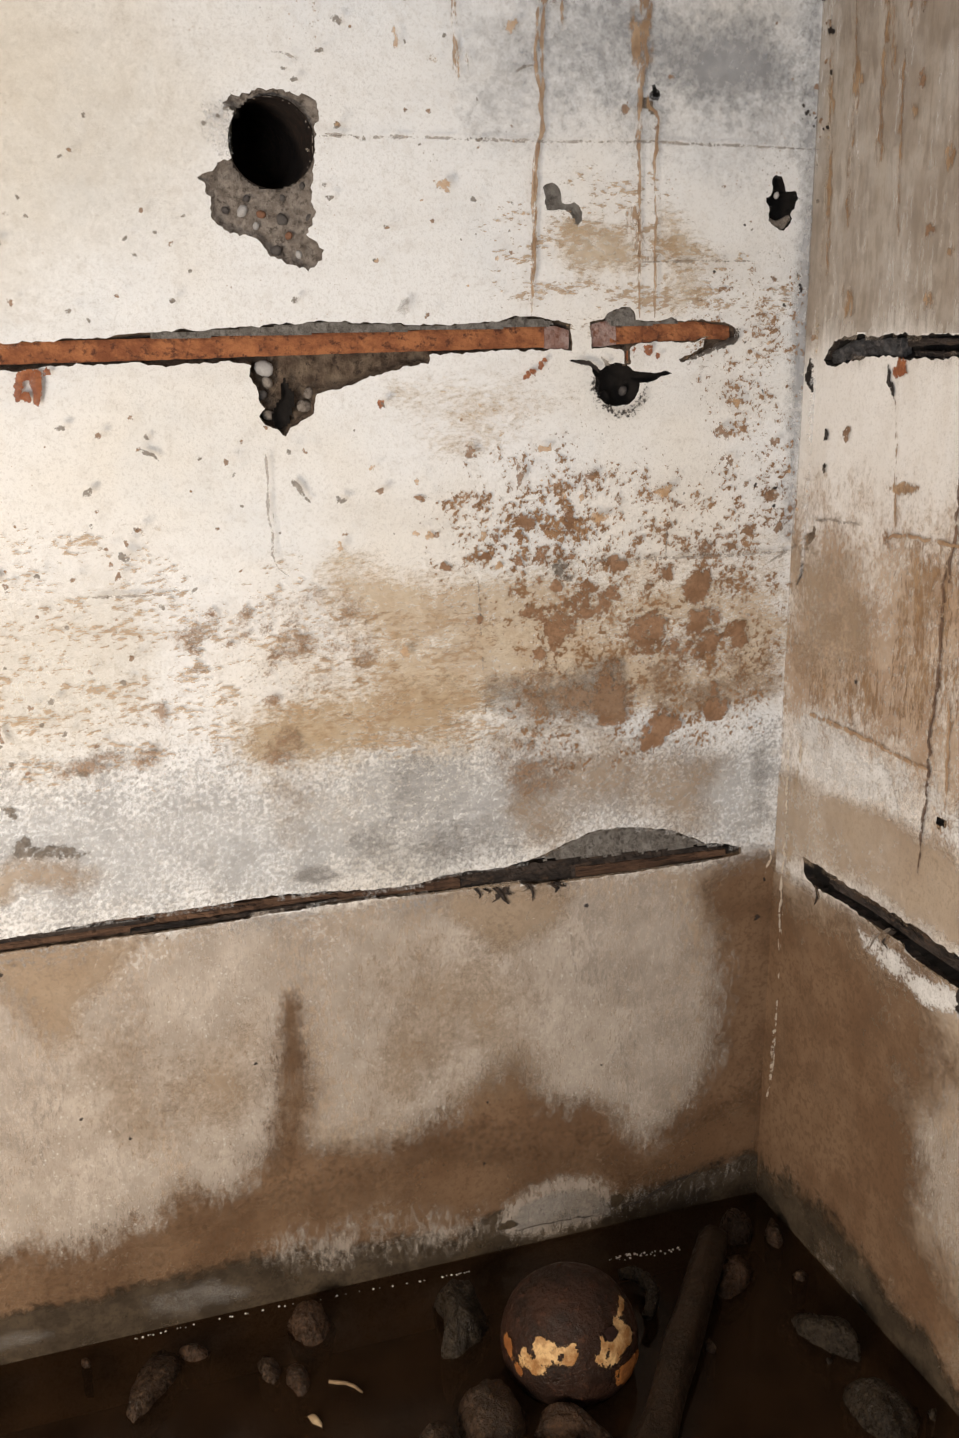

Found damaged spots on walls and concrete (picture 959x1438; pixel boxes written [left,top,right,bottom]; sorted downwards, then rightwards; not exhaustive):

spalling [197,51,359,271]
rust [530,0,564,312]
rust [621,0,660,318]
hole [766,177,793,230]
rust [523,358,548,380]
rust [625,345,660,361]
crack [805,358,814,392]
crack [594,482,959,873]
leakage [0,477,959,1416]
peeling [811,863,959,1016]
peeling [765,1000,778,1109]